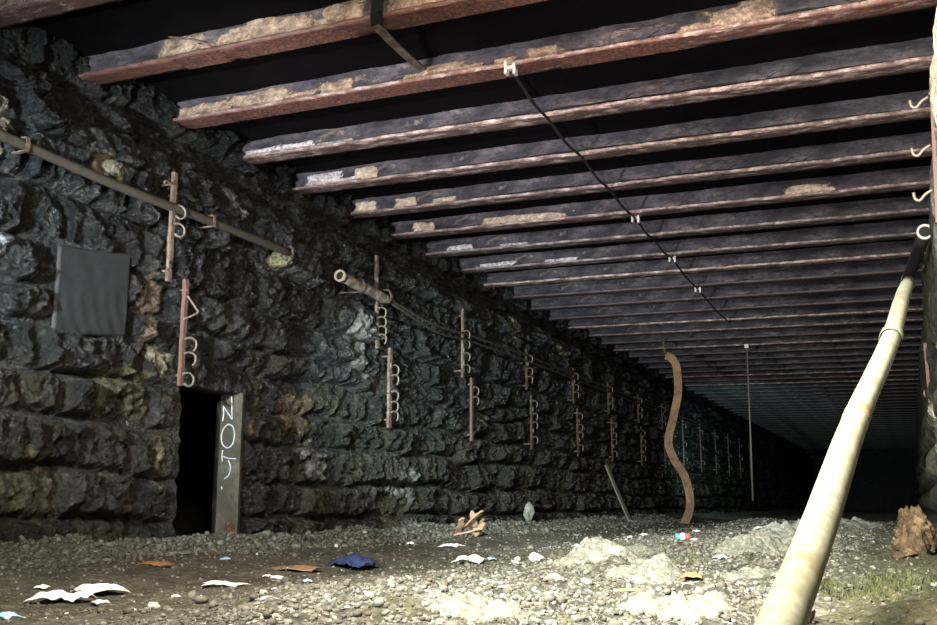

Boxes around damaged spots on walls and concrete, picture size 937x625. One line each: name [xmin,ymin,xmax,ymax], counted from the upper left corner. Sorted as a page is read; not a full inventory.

peeling [158,0,366,58]
spalling [676,0,777,33]
peeling [178,77,353,118]
peeling [783,184,836,195]
rust [842,400,873,427]